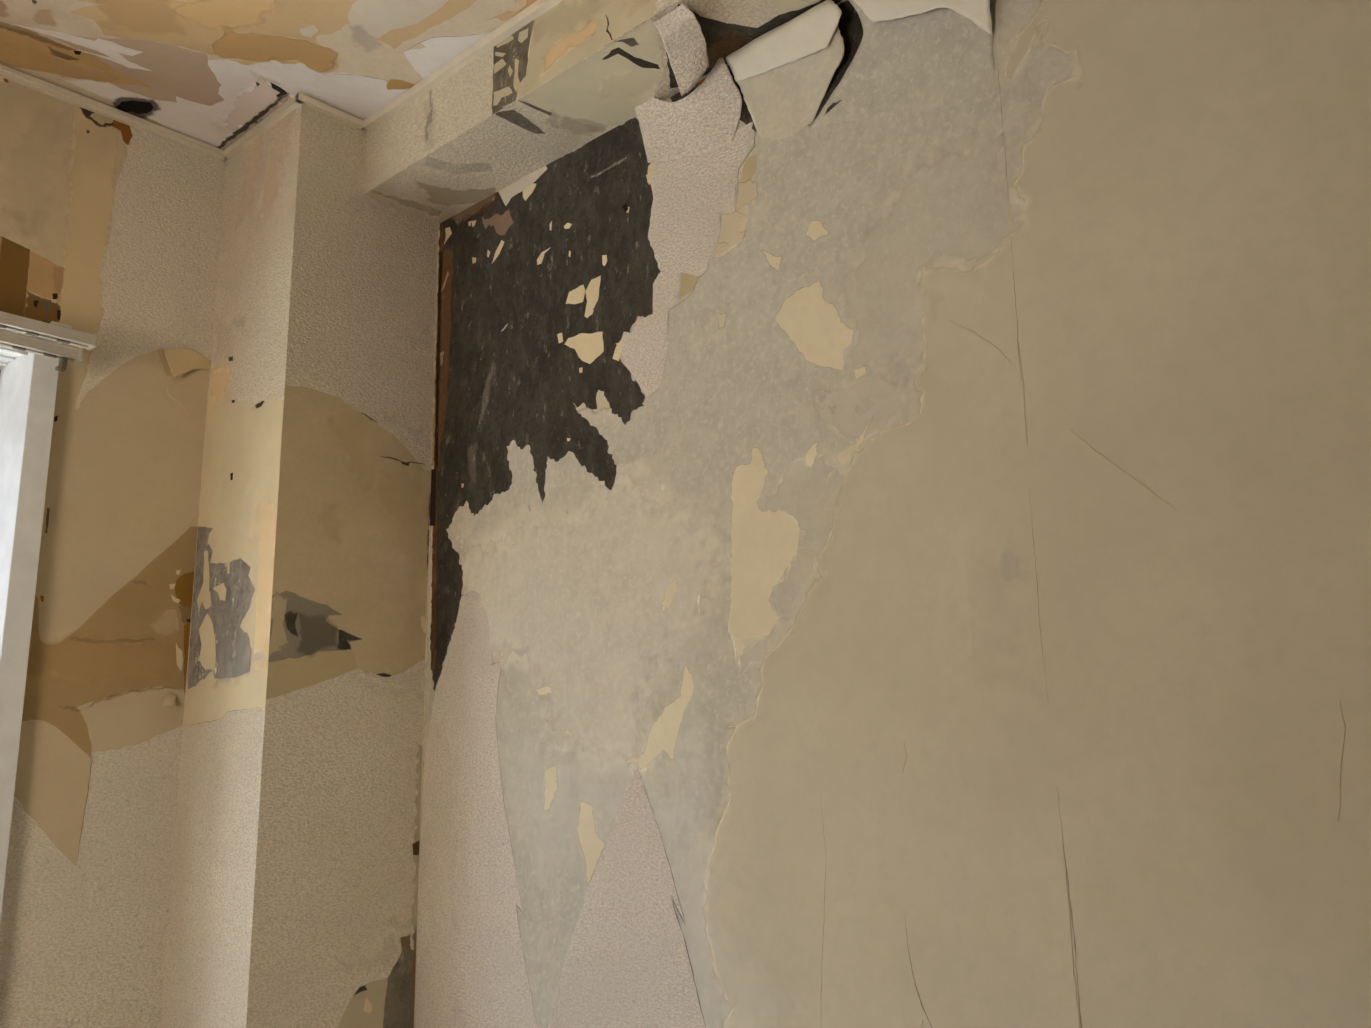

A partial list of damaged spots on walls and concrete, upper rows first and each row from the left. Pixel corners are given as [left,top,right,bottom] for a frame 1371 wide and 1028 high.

peeling [492,20,552,134]
peeling [664,0,863,132]
peeling [679,273,698,299]
peeling [430,117,661,691]
flaking render [188,526,363,689]
peeling [338,928,417,1028]